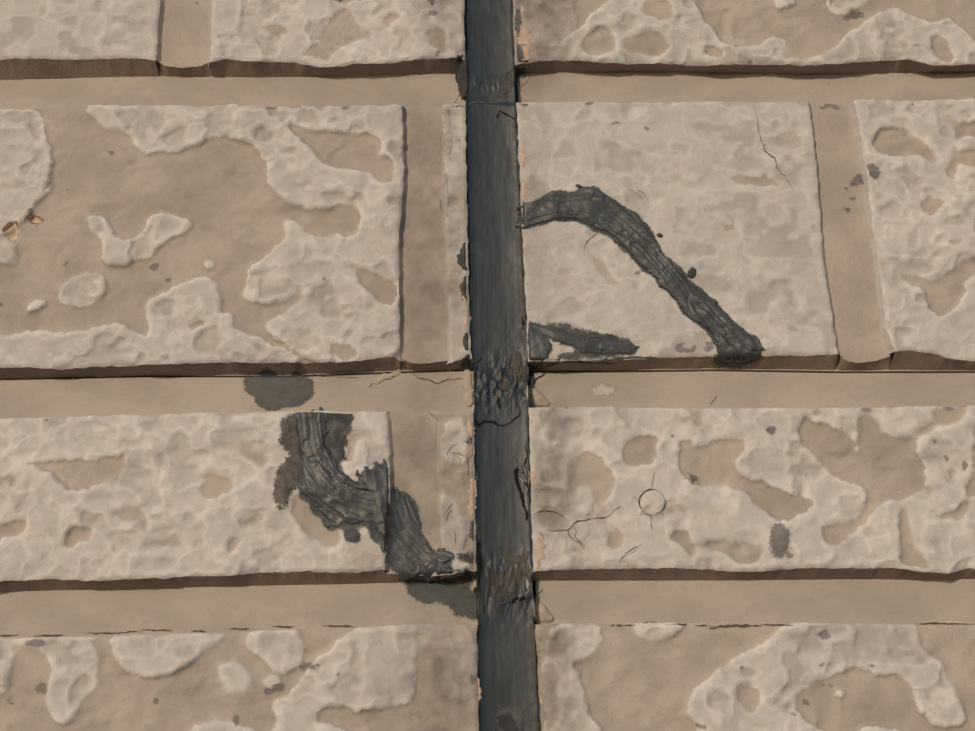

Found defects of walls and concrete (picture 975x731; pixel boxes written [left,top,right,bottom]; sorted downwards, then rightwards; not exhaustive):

peeling [517,27,532,61]
crack [754,108,794,190]
spalling [2,213,43,241]
crack [535,473,666,561]